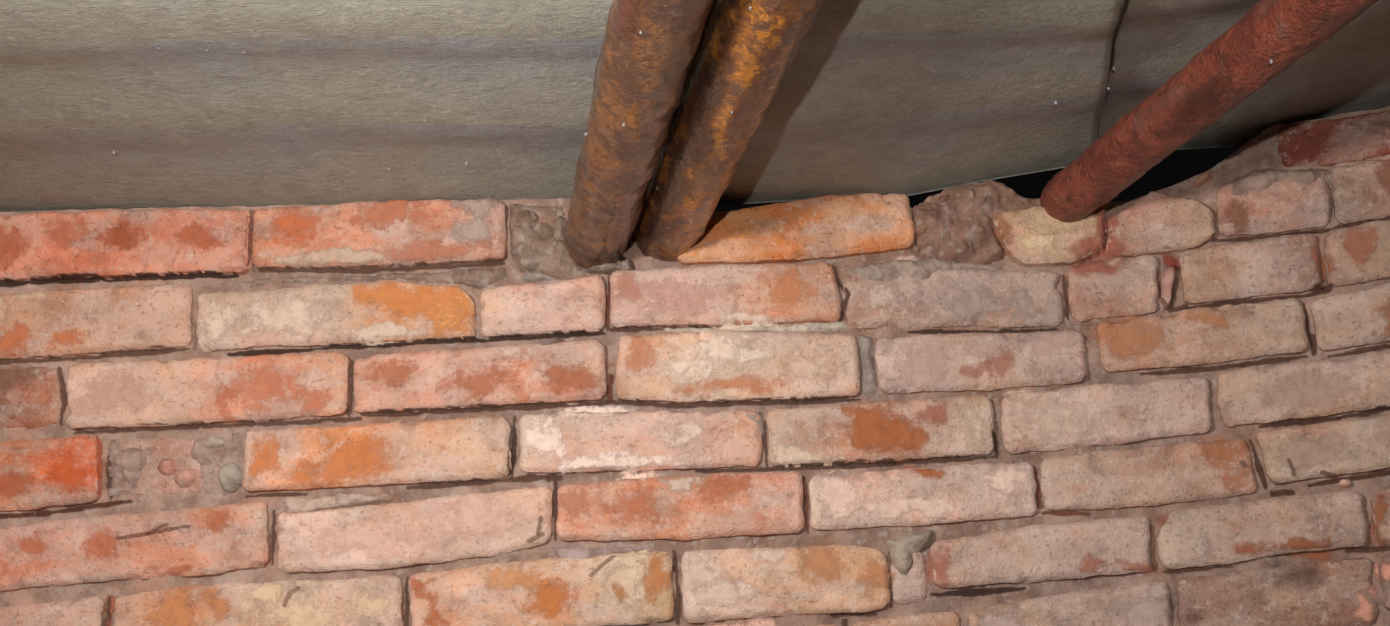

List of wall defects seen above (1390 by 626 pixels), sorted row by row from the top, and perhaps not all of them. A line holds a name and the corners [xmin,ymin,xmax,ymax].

crack [1109,0,1130,70]
corrosion [1071,208,1124,274]